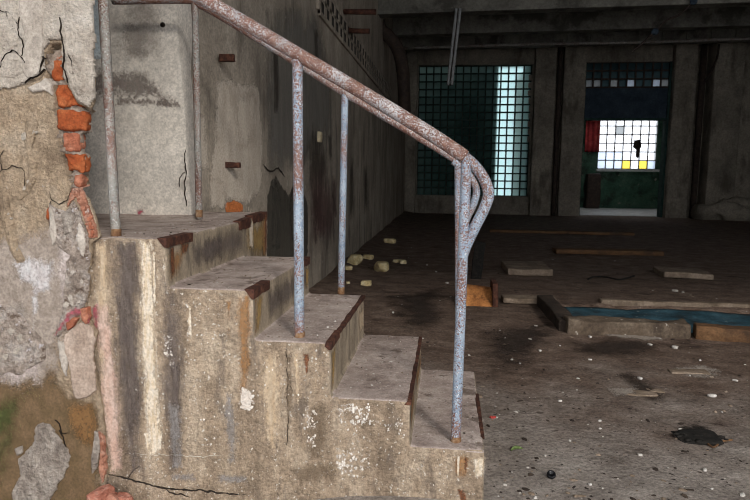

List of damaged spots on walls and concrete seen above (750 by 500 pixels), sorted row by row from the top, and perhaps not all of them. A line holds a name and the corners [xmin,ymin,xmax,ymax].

crack [0,10,73,83]
leakage [113,71,179,107]
crack [179,150,187,206]
flaking render [46,185,98,399]
flaking render [0,304,47,376]
leakage [0,229,192,500]
rust [239,296,262,390]
crack [108,466,245,497]